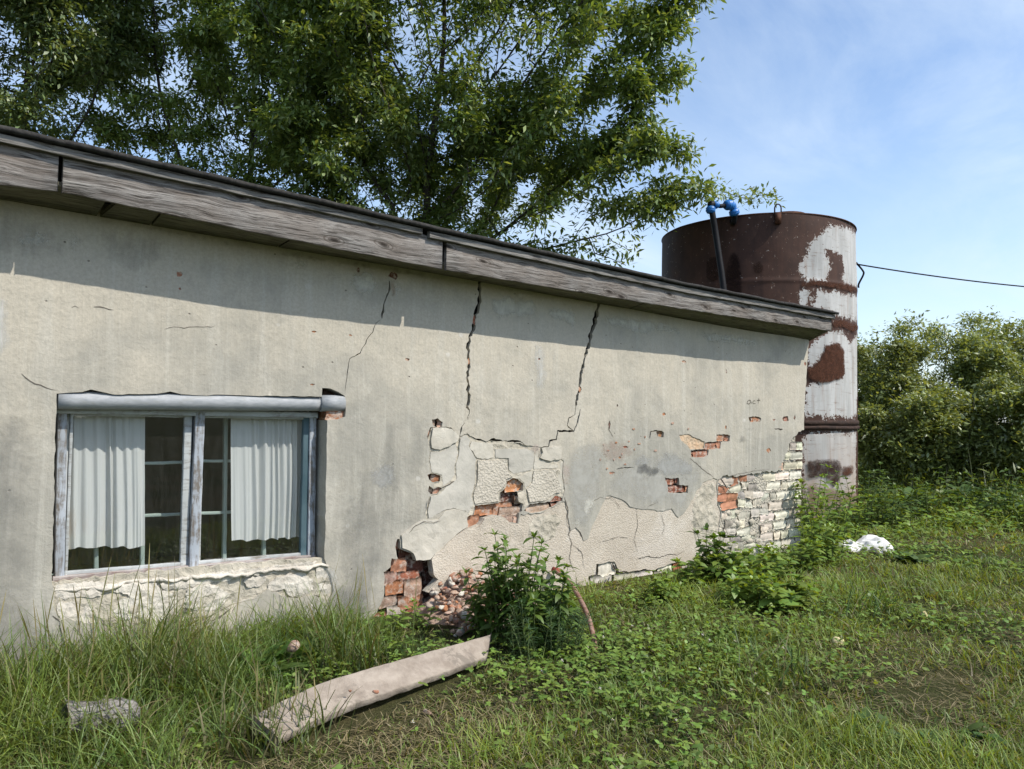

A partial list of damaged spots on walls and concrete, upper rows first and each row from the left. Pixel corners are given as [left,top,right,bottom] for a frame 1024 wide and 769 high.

flaking render [428,473,441,494]
flaking render [375,540,433,617]